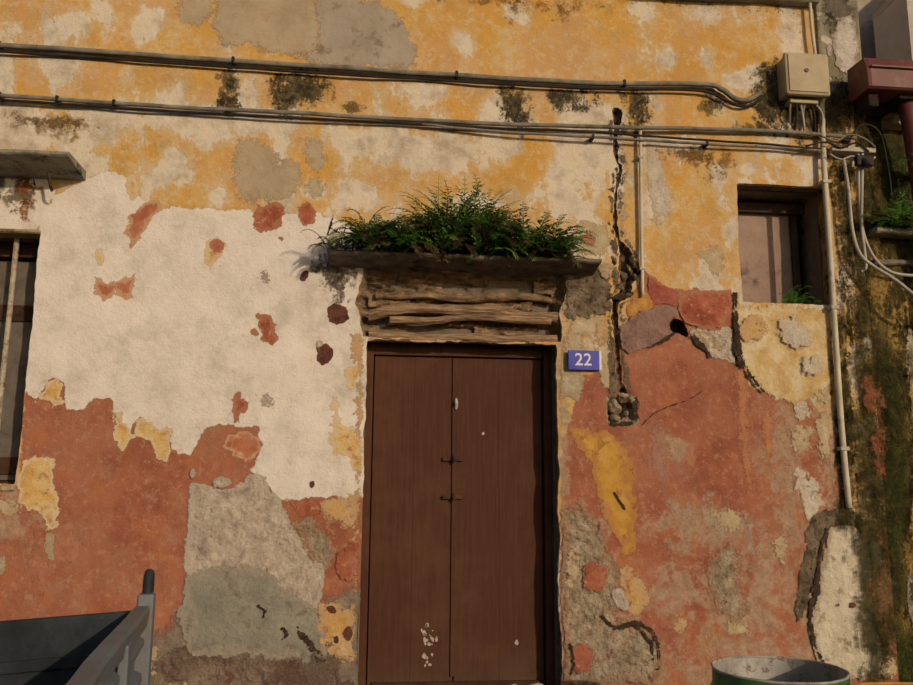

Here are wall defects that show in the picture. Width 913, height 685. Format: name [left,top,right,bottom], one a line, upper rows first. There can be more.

damp [267,68,335,121]
damp [496,85,534,138]
damp [546,89,603,113]
damp [619,90,653,138]
crack [607,108,641,403]
peeling [327,303,350,325]
crack [642,391,702,425]
spalling [559,220,662,685]
peeling [0,455,60,561]
spalling [182,333,365,665]
crack [808,527,829,662]
crack [600,615,661,670]